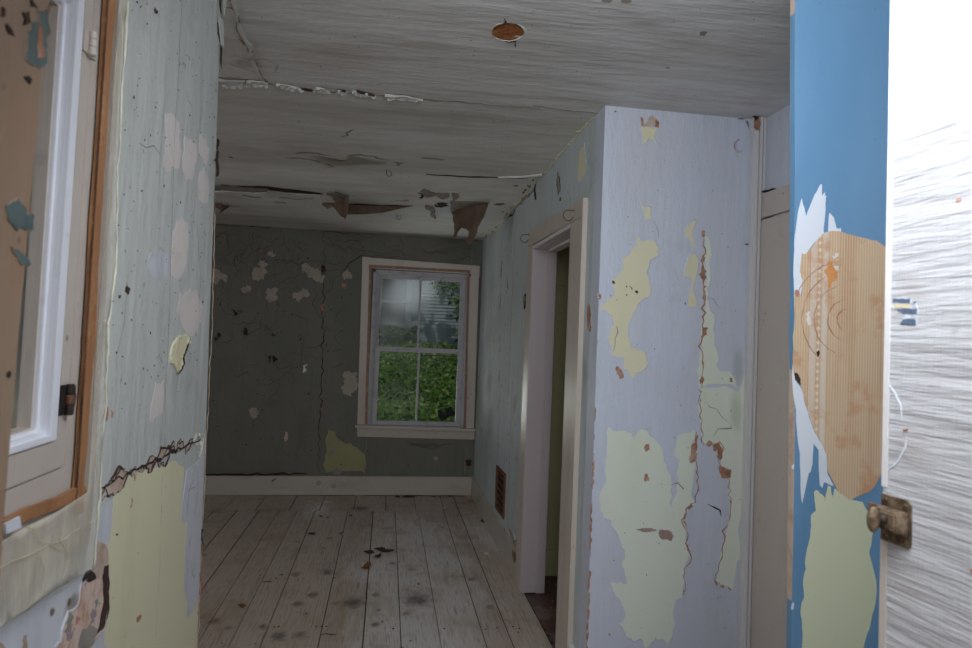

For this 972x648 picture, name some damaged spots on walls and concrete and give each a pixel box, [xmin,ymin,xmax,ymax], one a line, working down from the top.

crack [218,0,598,114]
spalling [4,198,35,231]
crack [141,0,476,528]
peeling [824,253,839,288]
peeling [305,416,366,475]
peeling [587,219,745,648]
peeling [0,563,93,648]
peeling [78,433,204,648]
peeling [791,483,877,648]